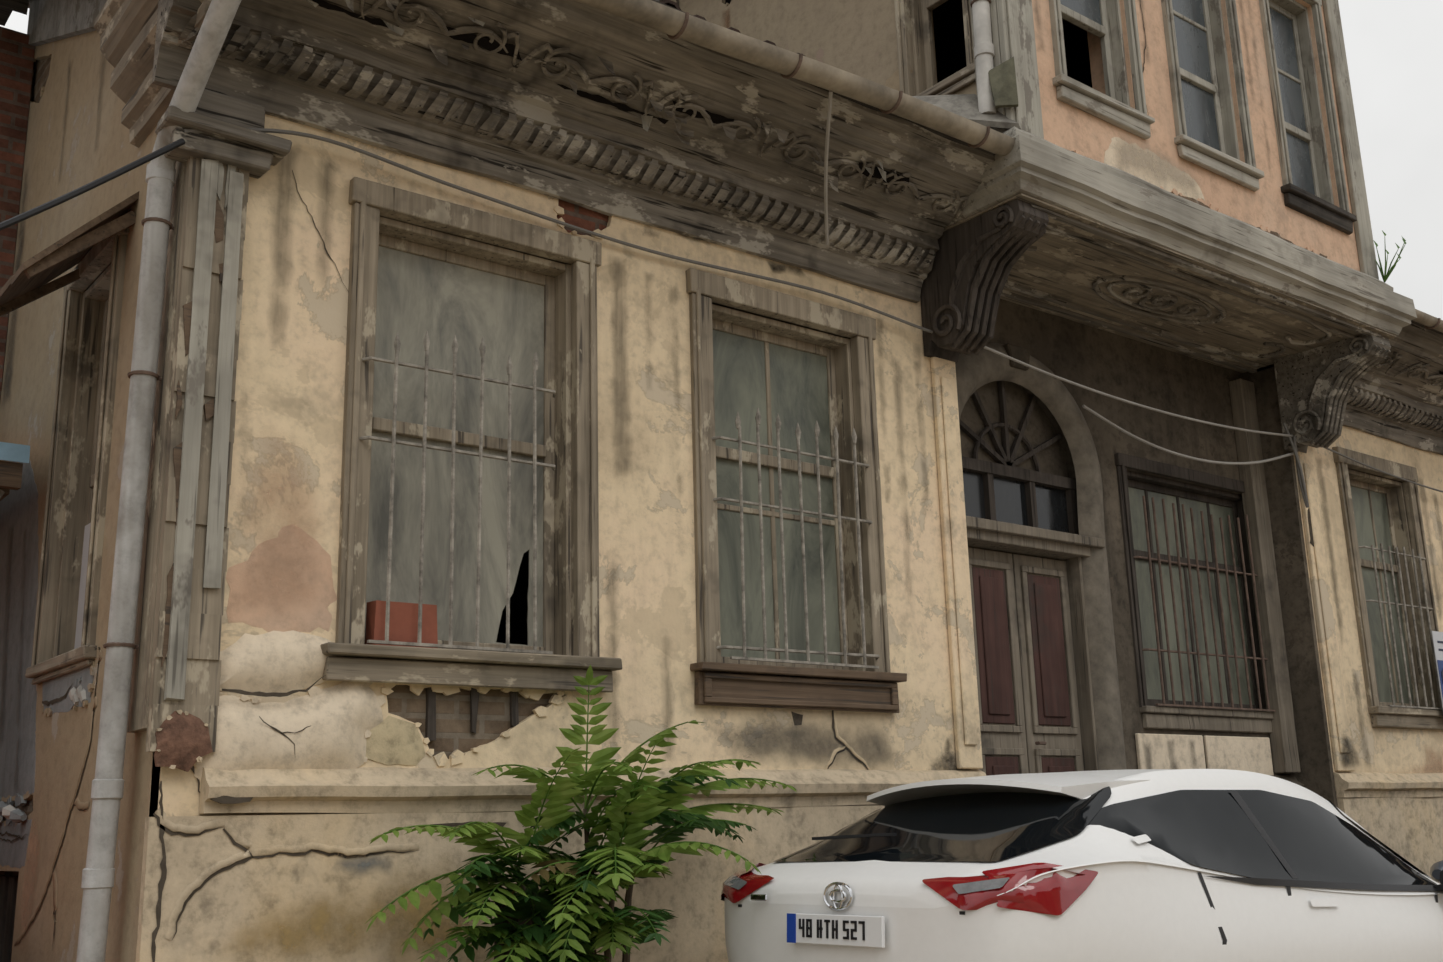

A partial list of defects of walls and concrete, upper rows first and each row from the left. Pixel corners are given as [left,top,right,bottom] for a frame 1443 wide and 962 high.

crack [292,170,349,293]
spalling [553,199,614,239]
peeling [865,161,891,203]
flaking render [0,459,95,869]
spalling [366,683,564,766]
crack [0,647,102,951]
crack [151,763,419,962]